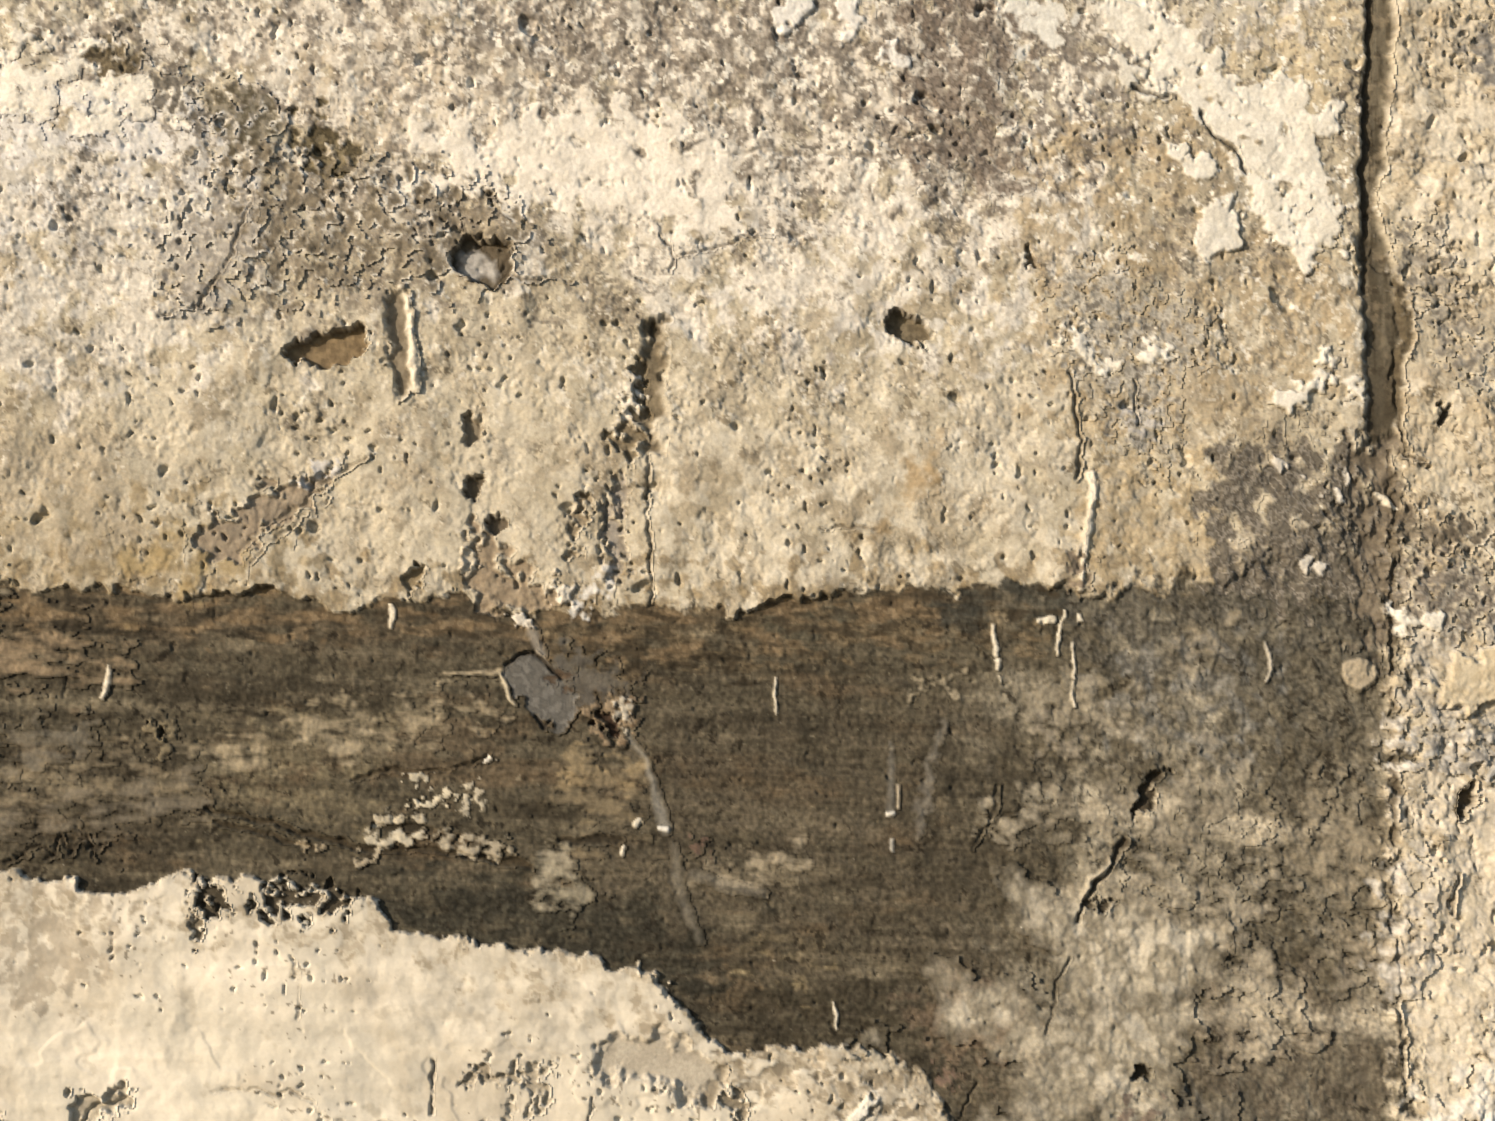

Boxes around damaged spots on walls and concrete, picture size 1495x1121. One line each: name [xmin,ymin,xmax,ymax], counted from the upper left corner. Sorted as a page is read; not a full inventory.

leakage [990,623,1001,659]
peeling [0,306,1495,1121]
crack [209,1058,438,1121]